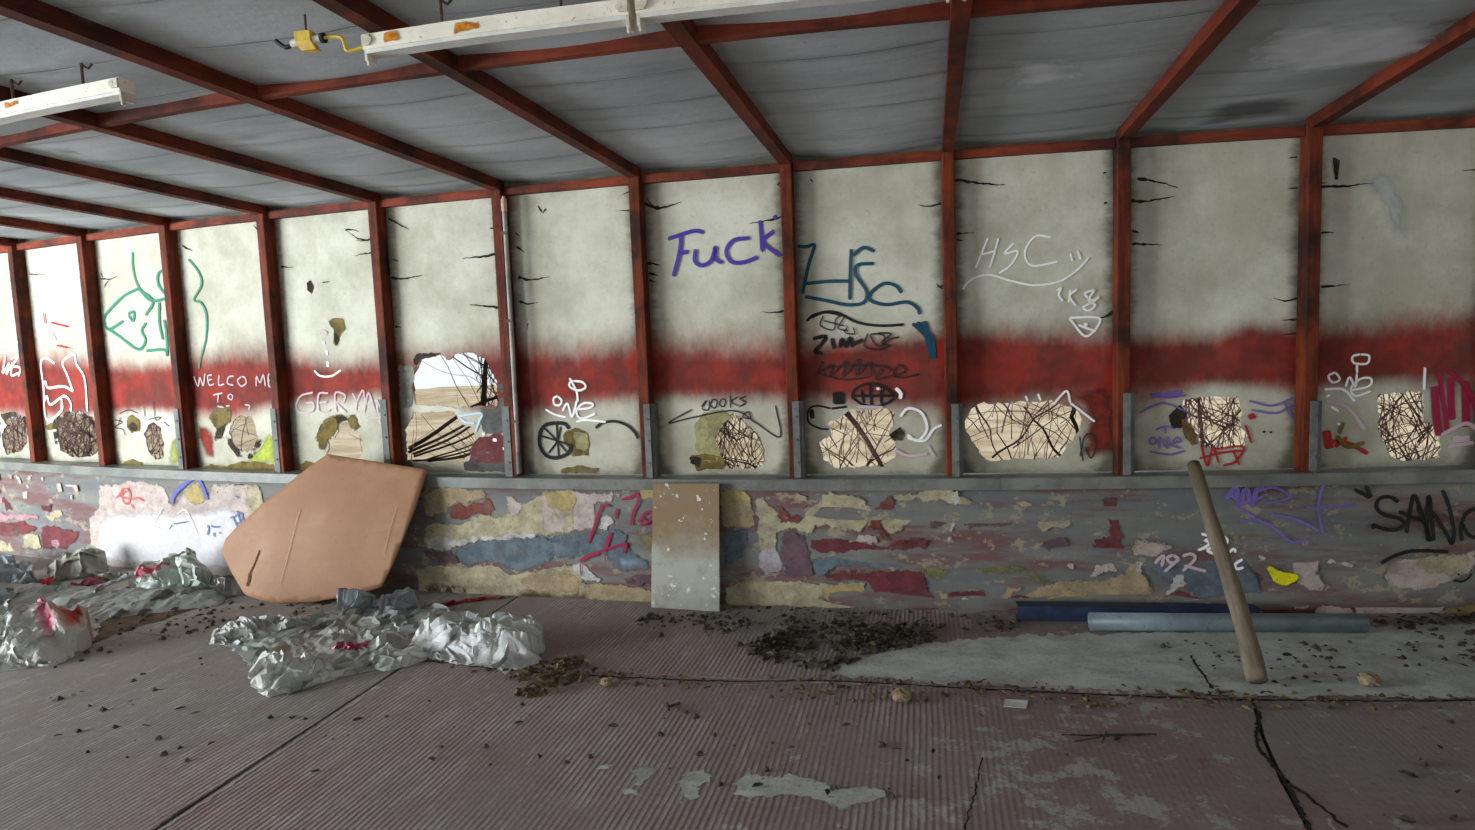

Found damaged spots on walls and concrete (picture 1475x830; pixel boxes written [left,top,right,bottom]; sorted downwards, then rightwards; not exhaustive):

spalling [413,352,440,365]
spalling [689,409,731,471]
spalling [890,427,904,441]
spalling [1169,405,1198,445]
peeling [416,383,651,602]
peeling [0,475,264,578]
peeling [720,490,1475,700]
crack [425,655,1475,830]
peeling [597,764,657,796]
peeling [677,769,711,805]
peeling [732,770,886,811]